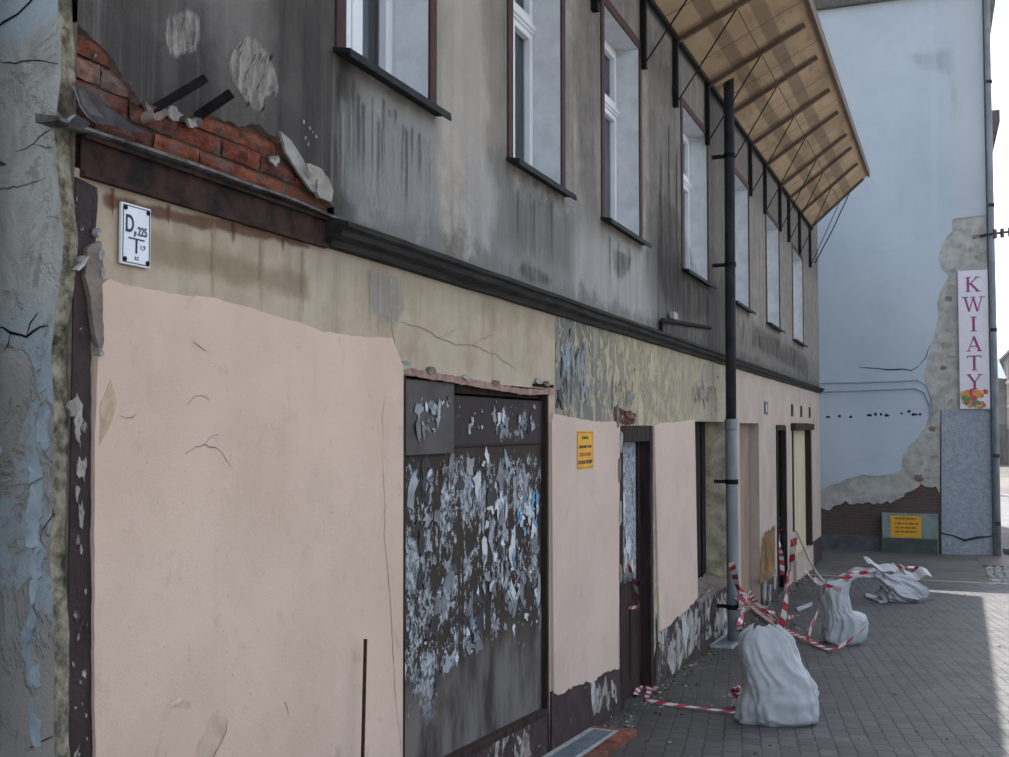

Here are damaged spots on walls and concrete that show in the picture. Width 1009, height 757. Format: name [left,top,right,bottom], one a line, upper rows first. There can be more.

crack [0,0,32,26]
crack [1,58,59,66]
spalling [76,32,334,202]
crack [0,313,48,349]
crack [382,294,512,367]
spalling [821,215,993,510]
peeling [65,393,88,555]
peeling [18,341,51,748]
peeling [657,587,727,675]
peeling [591,675,618,719]
peeling [487,717,532,757]